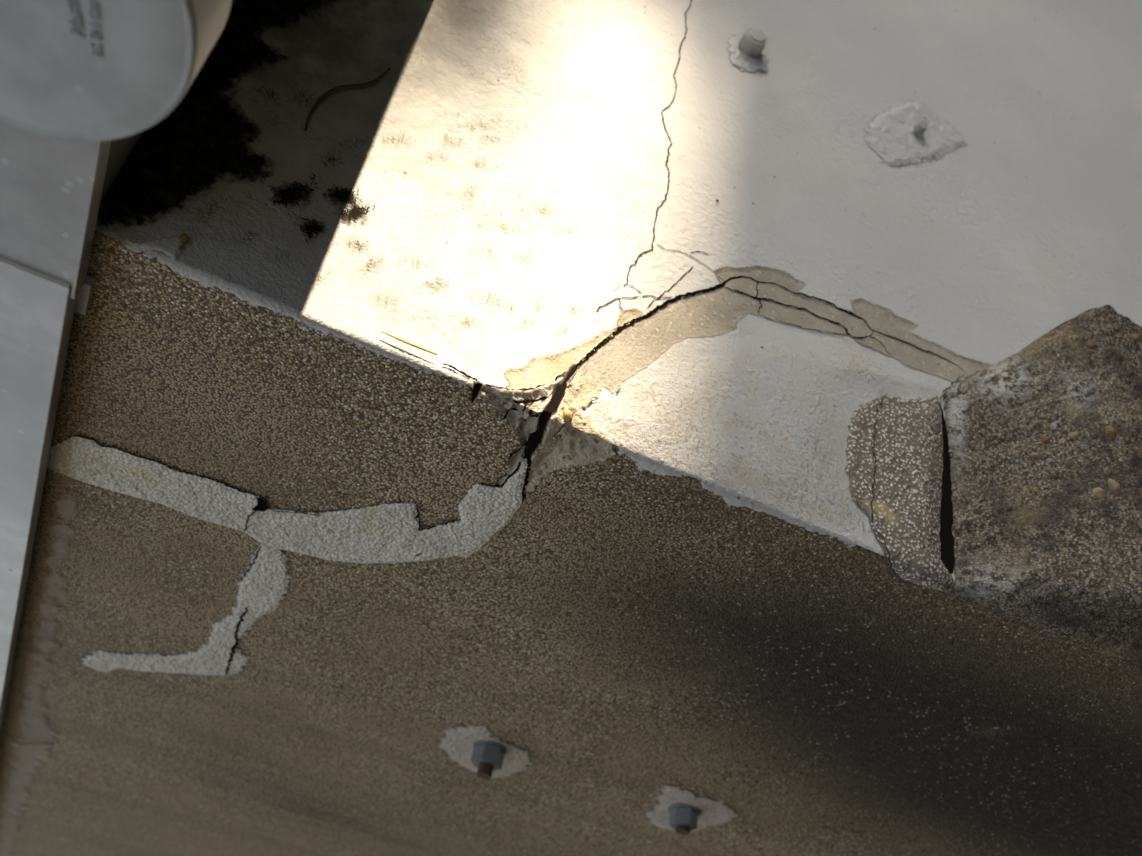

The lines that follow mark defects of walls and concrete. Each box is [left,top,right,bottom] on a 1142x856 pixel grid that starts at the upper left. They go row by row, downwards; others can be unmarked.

water stain [97,0,392,272]
water stain [417,275,454,295]
crack [522,0,964,503]
crack [472,383,483,402]
peeling [443,266,991,492]
peeling [252,497,268,512]
crack [870,394,902,580]